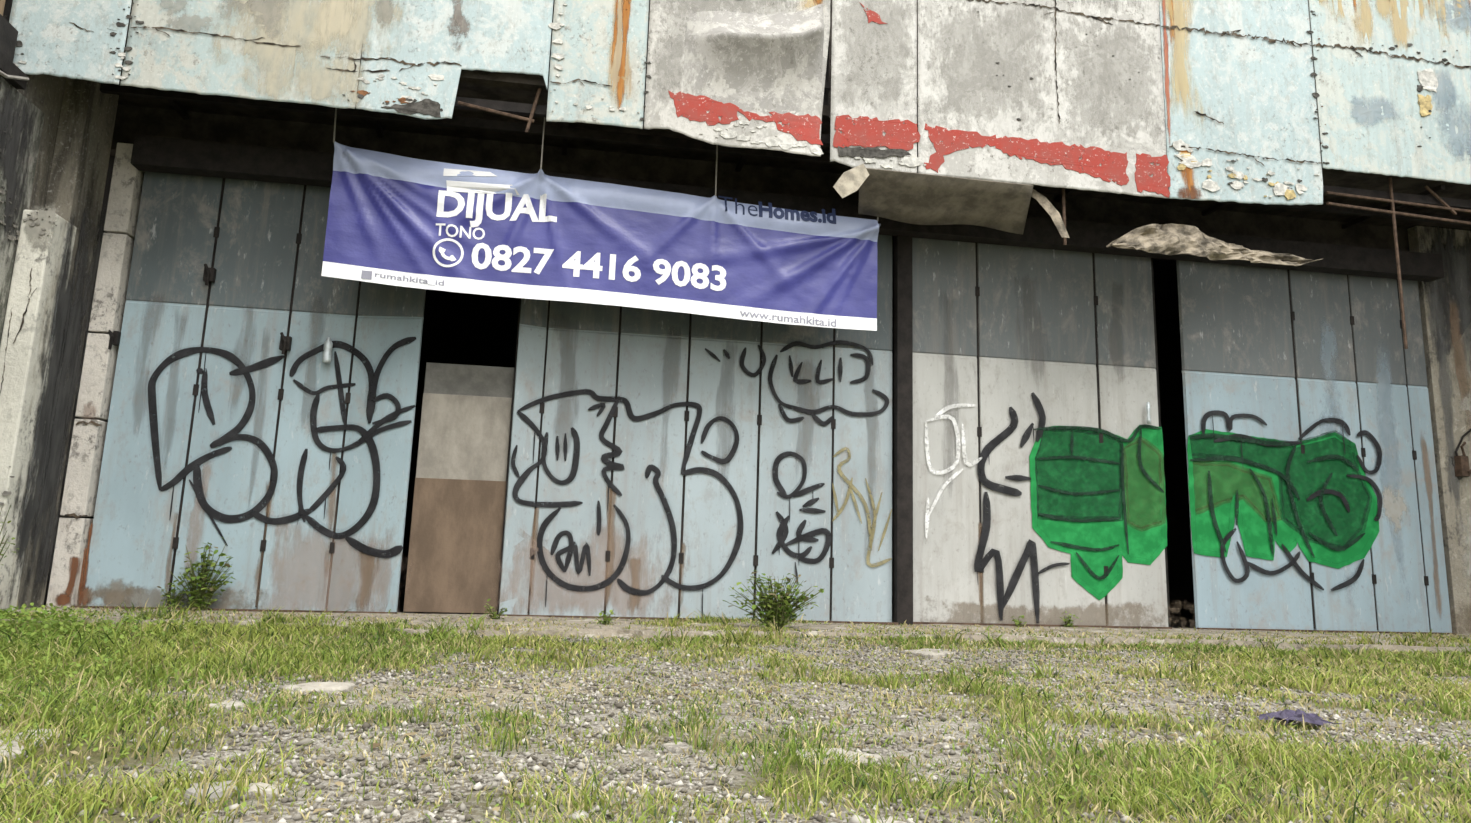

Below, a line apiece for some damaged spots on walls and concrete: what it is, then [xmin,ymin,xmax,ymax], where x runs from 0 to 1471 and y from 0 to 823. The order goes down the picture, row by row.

peeling [342,74,445,118]
peeling [548,3,652,120]
rust [610,0,631,107]
peeling [859,2,887,24]
peeling [668,10,1329,200]
rust [1162,0,1201,199]
rust [1319,0,1471,43]
leakage [1419,226,1471,611]
leakage [1383,488,1406,527]
rust [56,523,93,606]